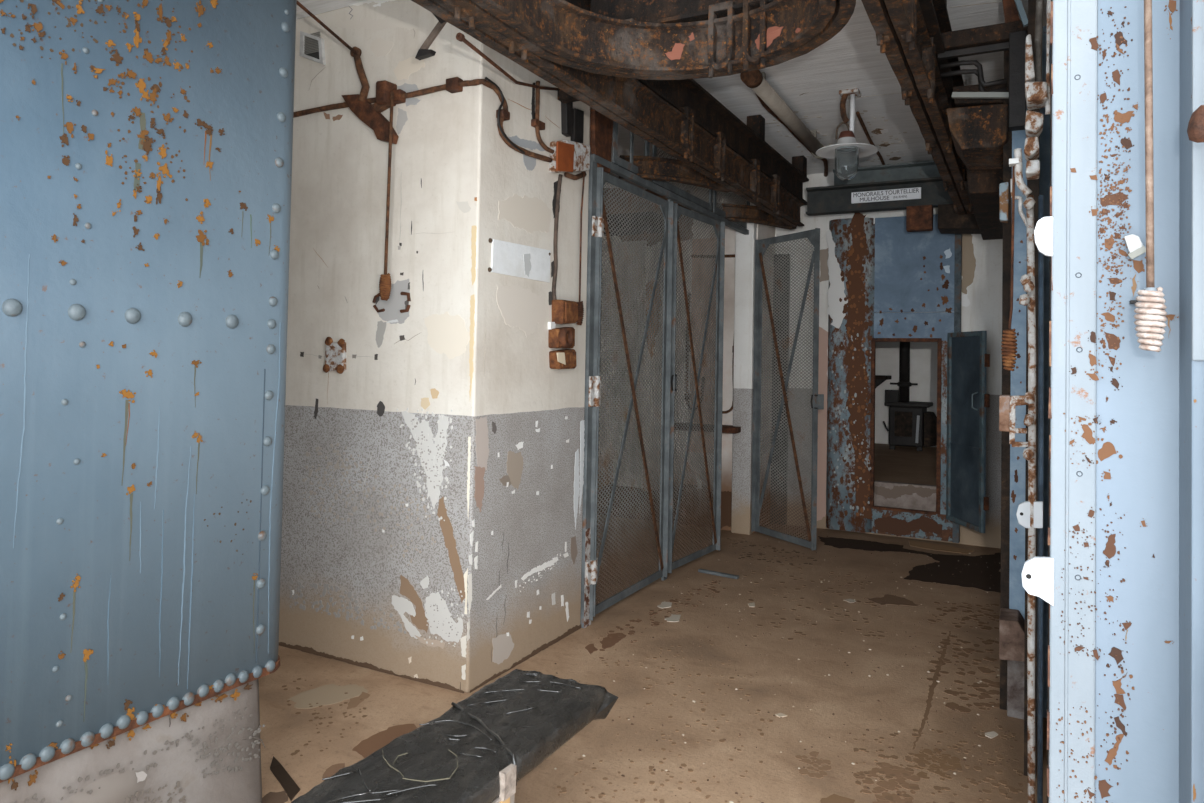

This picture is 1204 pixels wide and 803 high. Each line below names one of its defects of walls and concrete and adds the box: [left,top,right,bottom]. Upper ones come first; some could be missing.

corrosion [1164,0,1178,39]
corrosion [228,191,280,252]
corrosion [839,213,952,536]
corrosion [5,743,38,790]
corrosion [58,574,93,722]
corrosion [90,699,151,749]
corrosion [119,389,152,561]
corrosion [192,431,203,494]
peeling [392,416,569,680]
peeling [565,416,585,530]
damp [743,536,1024,803]
corrosion [1056,413,1135,803]